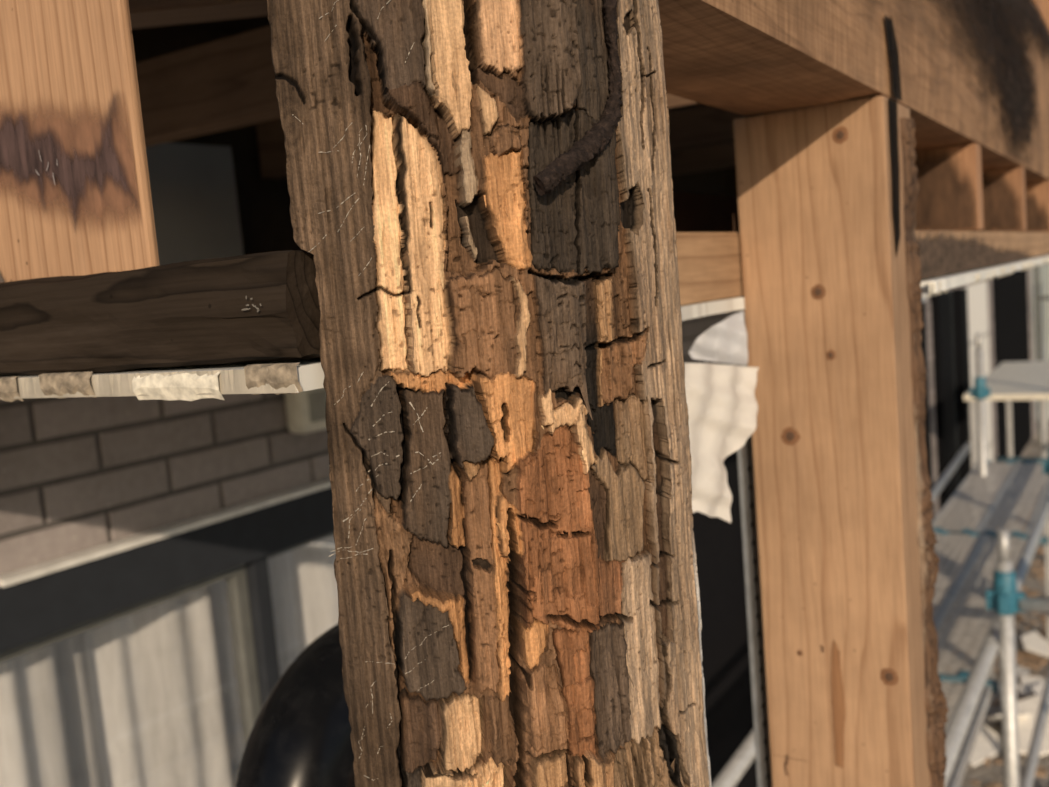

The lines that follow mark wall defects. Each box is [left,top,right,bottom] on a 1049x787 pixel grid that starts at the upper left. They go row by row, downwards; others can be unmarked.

damp [0,99,139,222]
crack [358,116,434,329]
crack [463,0,481,85]
spalling [474,63,530,123]
crack [585,0,659,351]
spalling [623,10,635,36]
damp [941,0,1049,152]
crack [343,384,413,506]
crack [500,403,510,442]
spalling [351,81,696,787]
crack [388,546,479,787]
crack [506,508,679,787]